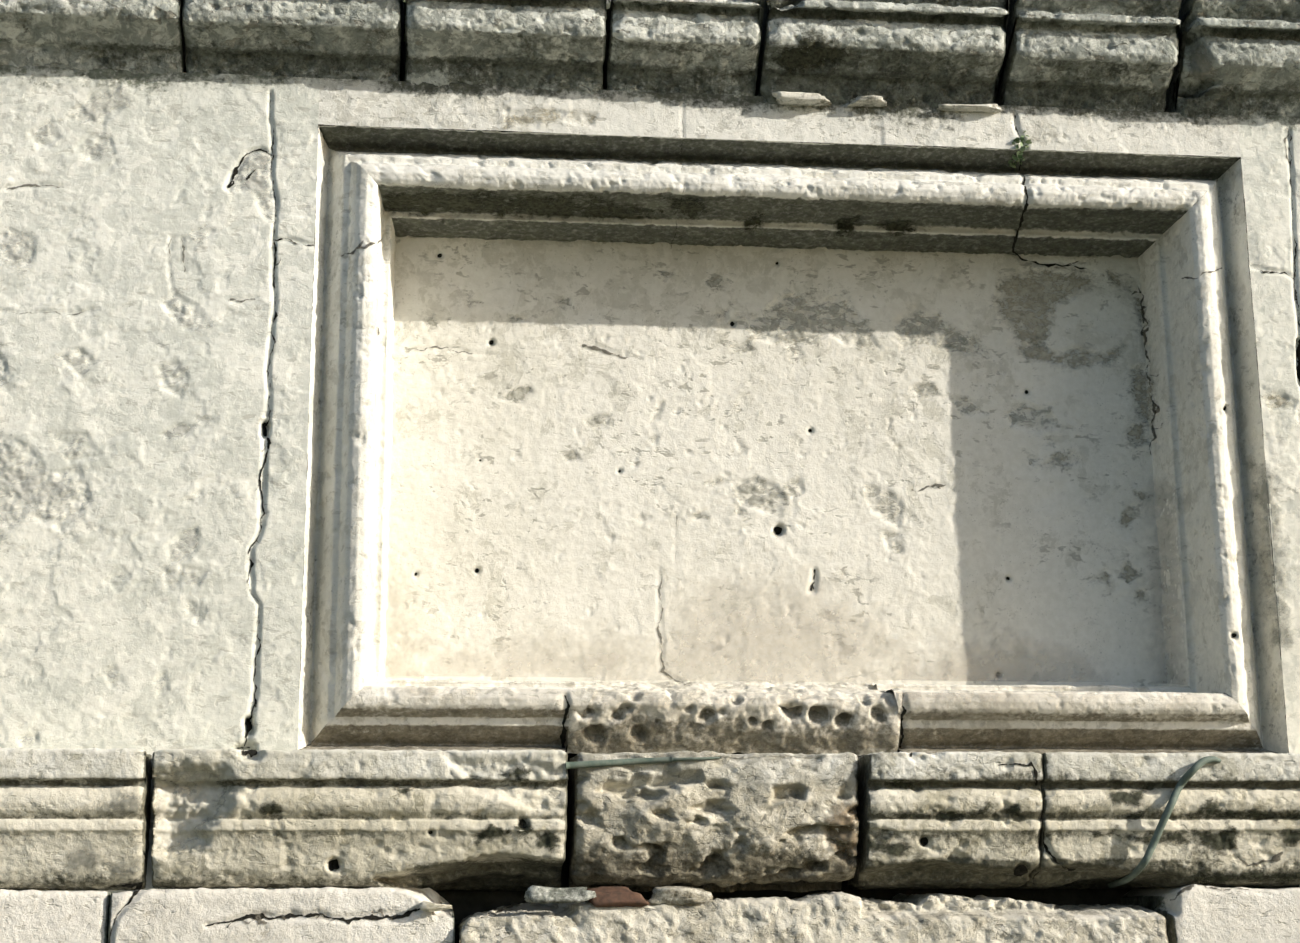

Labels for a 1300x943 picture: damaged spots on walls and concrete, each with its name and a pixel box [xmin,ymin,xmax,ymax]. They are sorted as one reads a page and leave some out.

crack [1012,115,1094,271]
crack [1261,128,1300,382]
crack [227,92,382,757]
crack [1132,289,1163,454]
crack [657,580,690,686]
crack [206,902,442,928]